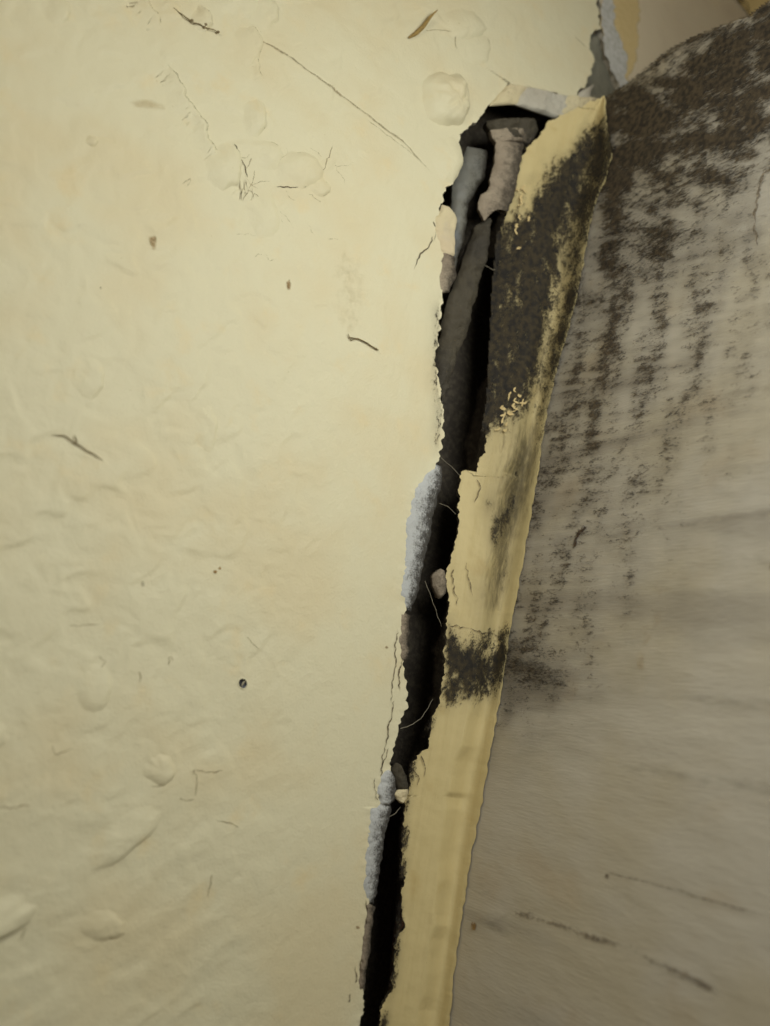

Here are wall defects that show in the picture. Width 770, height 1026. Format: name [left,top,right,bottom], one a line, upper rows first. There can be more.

crack [415,34,615,404]
damp [441,1,770,712]
spalling [600,0,641,87]
crack [349,465,490,1002]